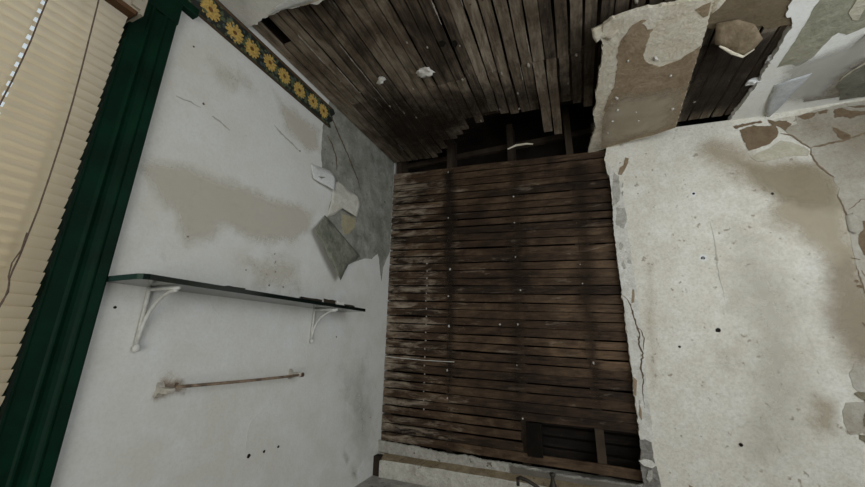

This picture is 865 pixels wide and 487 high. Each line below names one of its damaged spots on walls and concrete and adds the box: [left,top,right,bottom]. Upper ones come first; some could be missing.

peeling [695,2,711,18]
damp [152,167,307,238]
peeling [321,101,394,281]
flaking render [378,157,661,487]
crack [621,294,645,405]
damp [707,145,865,357]
peeling [734,0,865,293]
peeling [842,363,865,442]